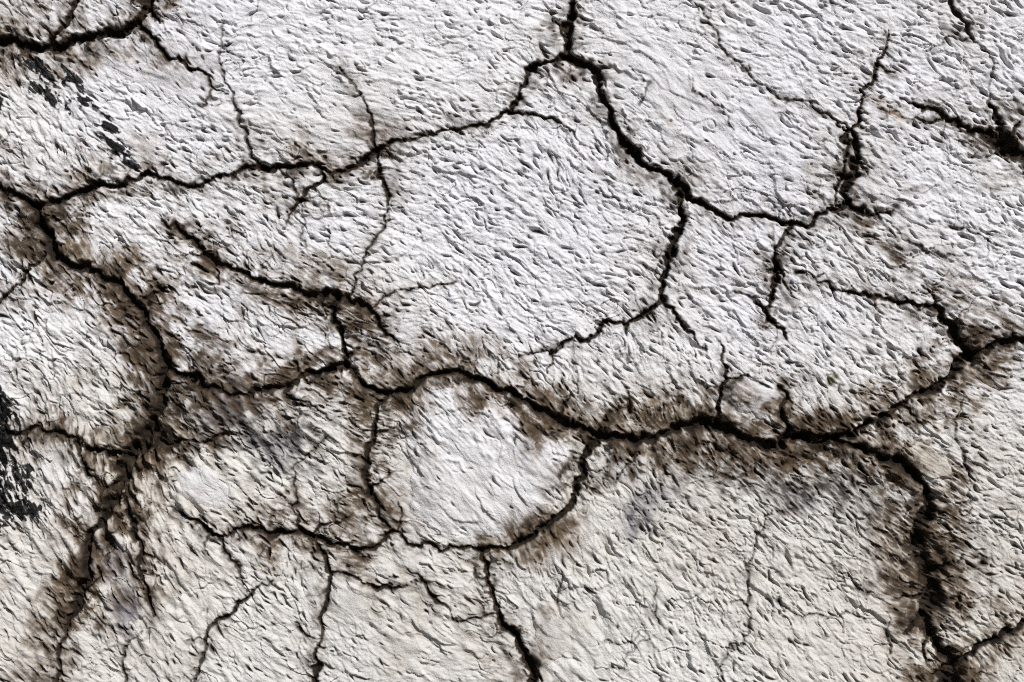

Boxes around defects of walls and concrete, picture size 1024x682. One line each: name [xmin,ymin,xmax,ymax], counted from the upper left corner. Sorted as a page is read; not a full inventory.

crack [0,0,227,107]
water stain [227,113,442,222]
crack [506,0,894,359]
crack [899,97,1024,163]
crack [948,0,976,43]
crack [0,68,508,682]
water stain [0,162,1024,682]
crack [164,211,1024,682]